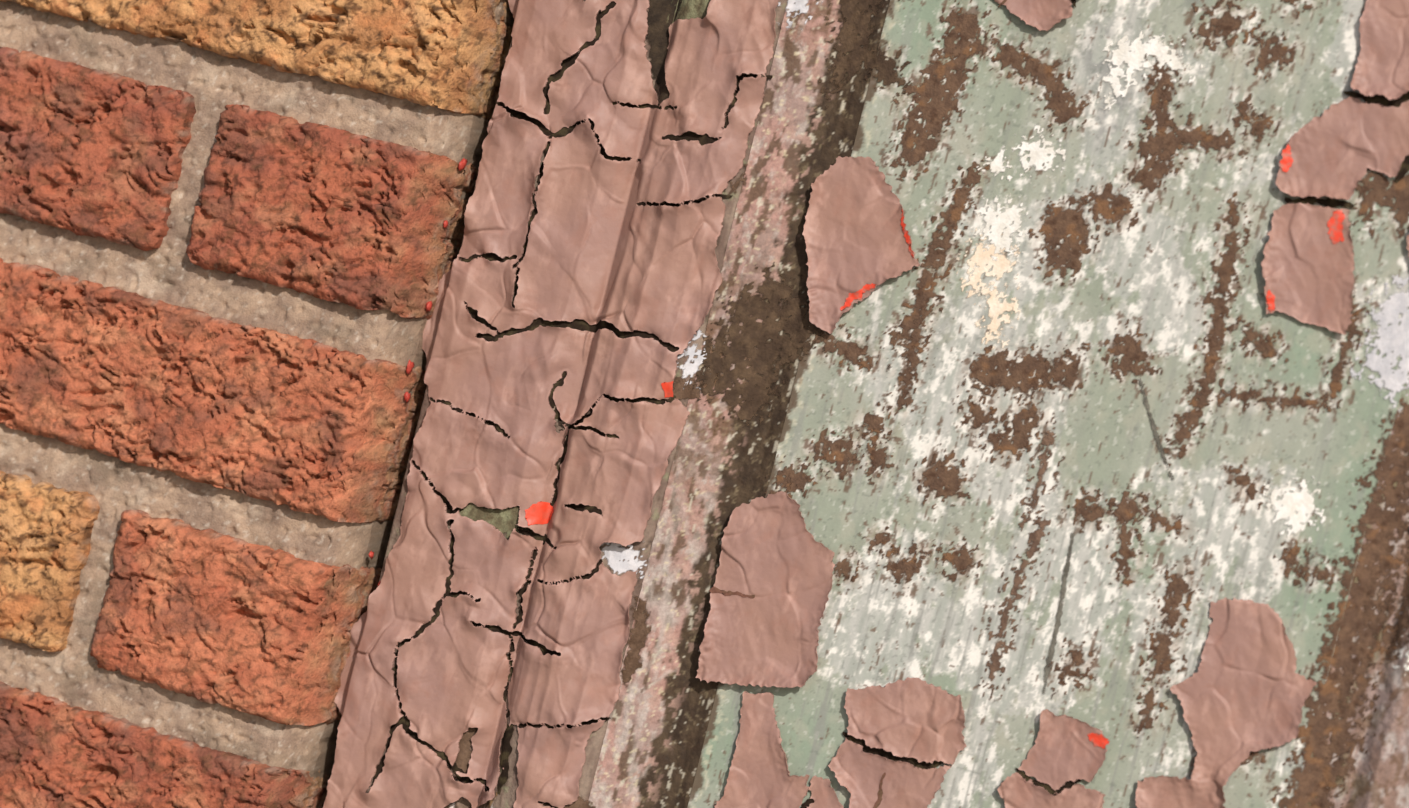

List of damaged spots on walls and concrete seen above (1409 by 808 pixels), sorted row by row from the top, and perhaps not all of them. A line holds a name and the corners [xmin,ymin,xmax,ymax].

crack [461,1,773,352]
peeling [802,156,920,334]
peeling [957,125,1066,353]
crack [1284,196,1354,208]
peeling [1261,0,1409,409]
crack [1343,91,1409,107]
crack [369,371,676,795]
peeling [696,491,967,808]
crack [842,732,946,808]
crack [1015,768,1081,796]
peeling [997,709,1110,808]
peeling [1135,597,1317,808]